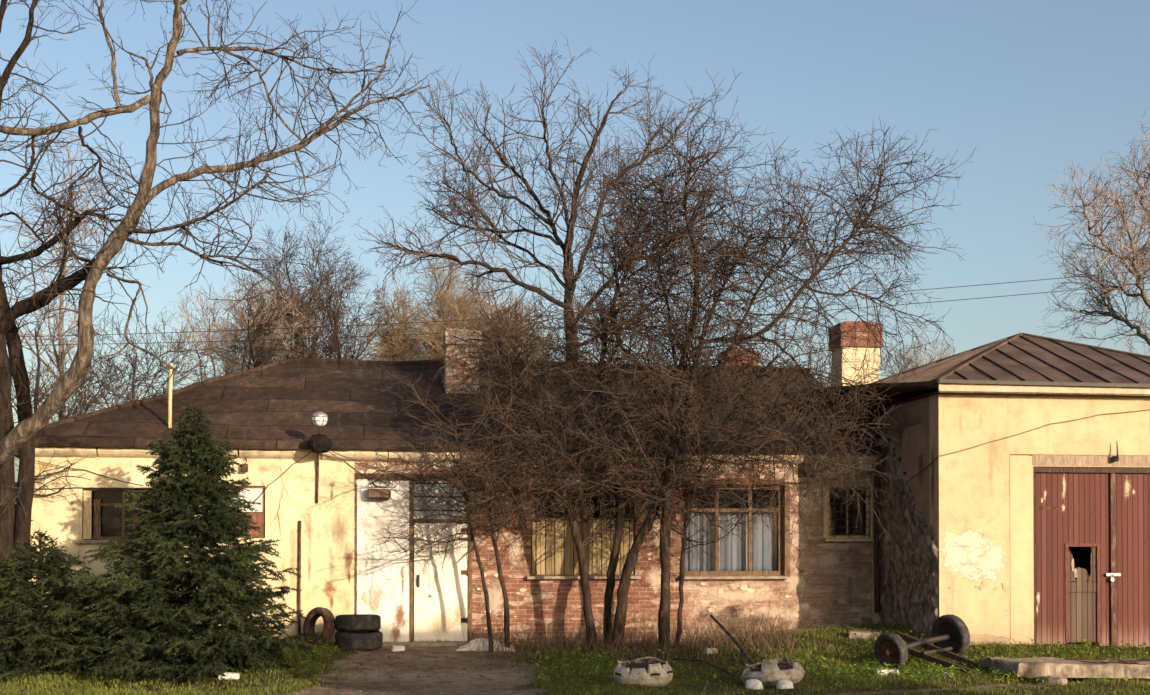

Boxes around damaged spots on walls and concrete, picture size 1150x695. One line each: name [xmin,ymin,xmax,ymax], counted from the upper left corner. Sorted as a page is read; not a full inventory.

corrosion [393,607,404,641]
flaking render [791,428,1009,638]